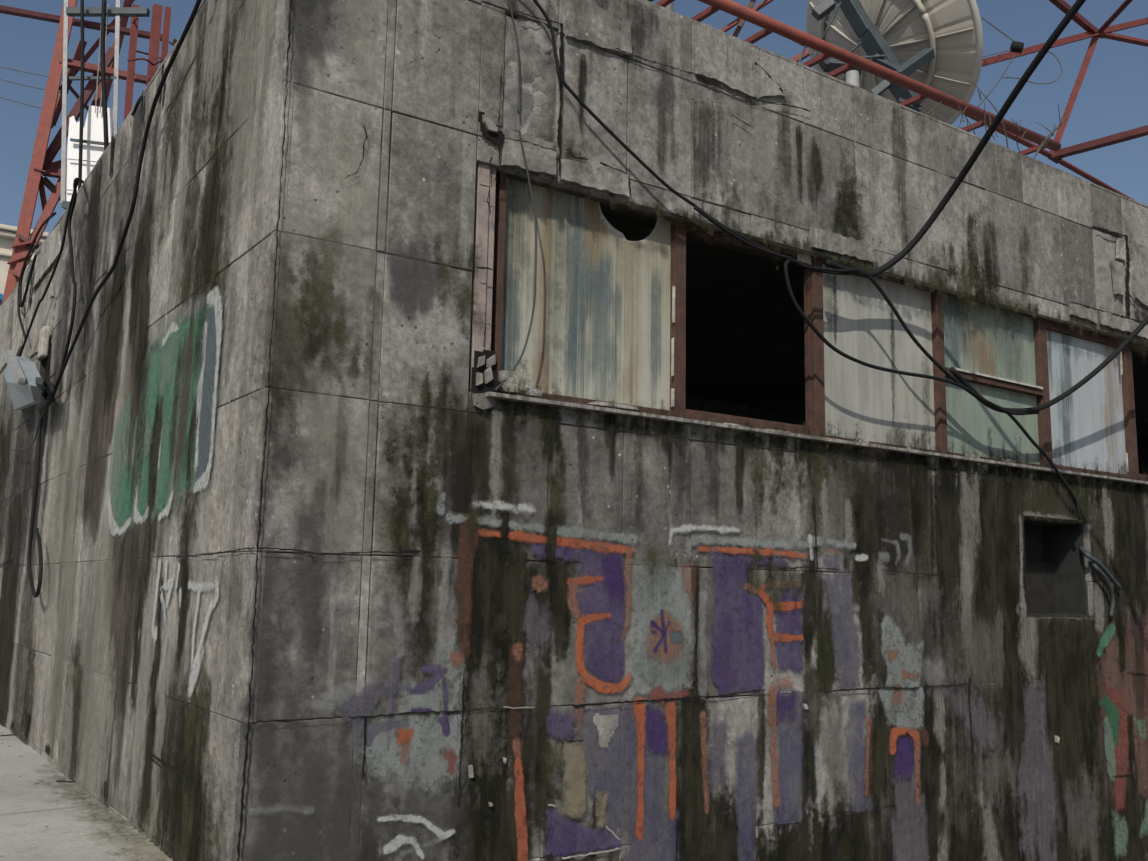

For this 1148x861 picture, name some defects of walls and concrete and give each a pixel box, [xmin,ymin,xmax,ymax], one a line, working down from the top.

crack [141,62,164,125]
spalling [479,16,629,198]
crack [615,48,810,127]
crack [107,135,115,176]
crack [28,257,57,308]
leakage [0,0,624,861]
crack [177,0,535,861]
leakage [548,103,1148,861]
crack [572,565,766,707]
crack [825,680,973,746]
crack [147,750,197,788]